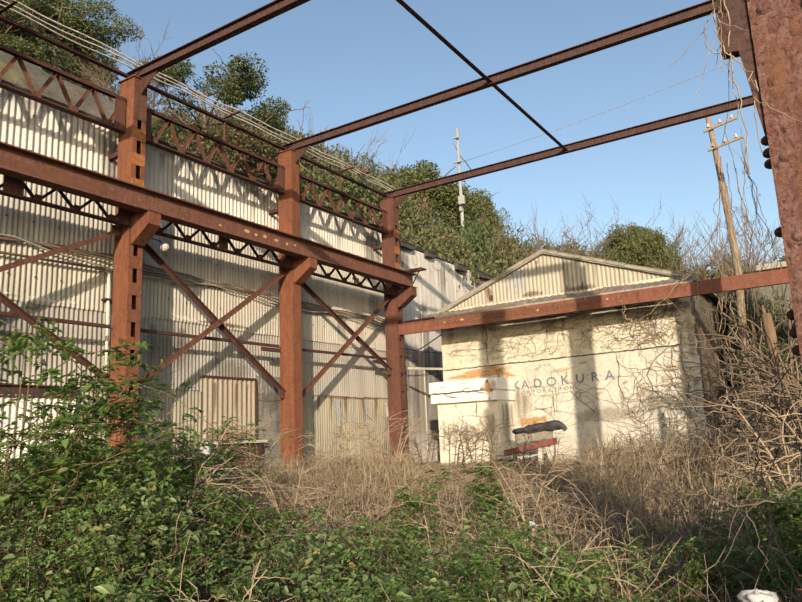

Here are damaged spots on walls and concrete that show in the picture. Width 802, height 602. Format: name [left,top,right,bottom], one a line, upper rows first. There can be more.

corrosion [747,0,802,365]
corrosion [452,366,513,379]